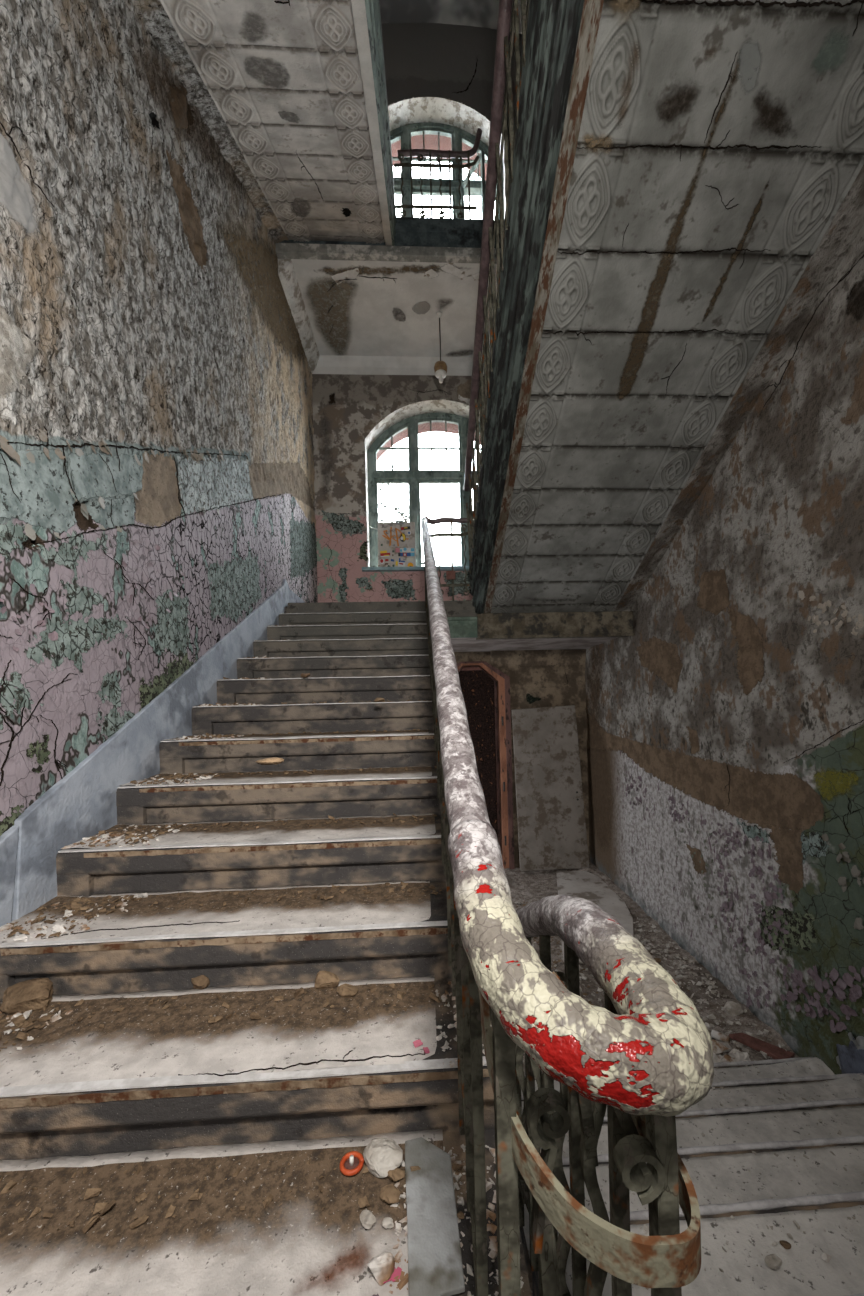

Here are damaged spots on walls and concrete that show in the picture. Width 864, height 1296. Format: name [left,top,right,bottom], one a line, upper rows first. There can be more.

damp [244,14,289,88]
peeling [331,268,360,284]
damp [308,265,441,355]
damp [617,49,740,400]
damp [703,182,769,322]
peeling [0,428,416,745]
spalling [635,636,683,693]
spalling [697,569,764,695]
peeling [798,591,864,636]
peeling [26,734,51,778]
peeling [0,803,24,836]
spalling [586,711,864,1049]